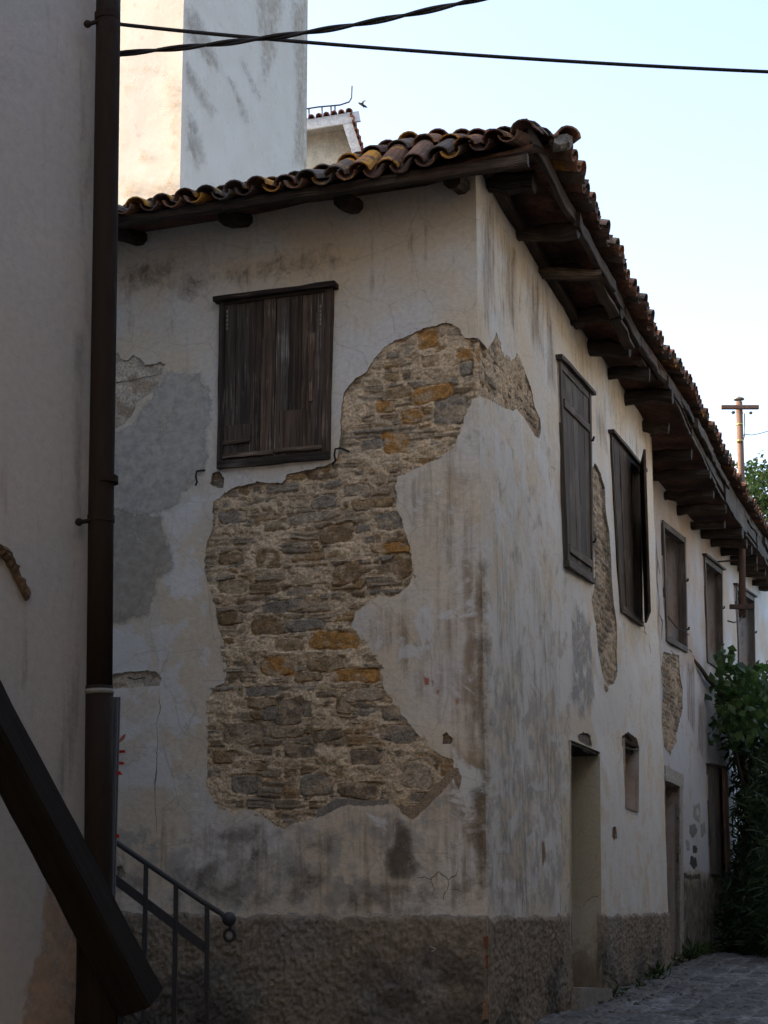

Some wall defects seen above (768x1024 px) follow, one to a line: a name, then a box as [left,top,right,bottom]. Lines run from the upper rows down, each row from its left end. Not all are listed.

flaking render [113,322,541,829]
flaking render [592,463,617,692]
flaking render [661,650,683,756]
water stain [387,826,415,876]
crack [420,867,461,901]
water stain [475,792,486,884]
peeling [677,803,706,881]